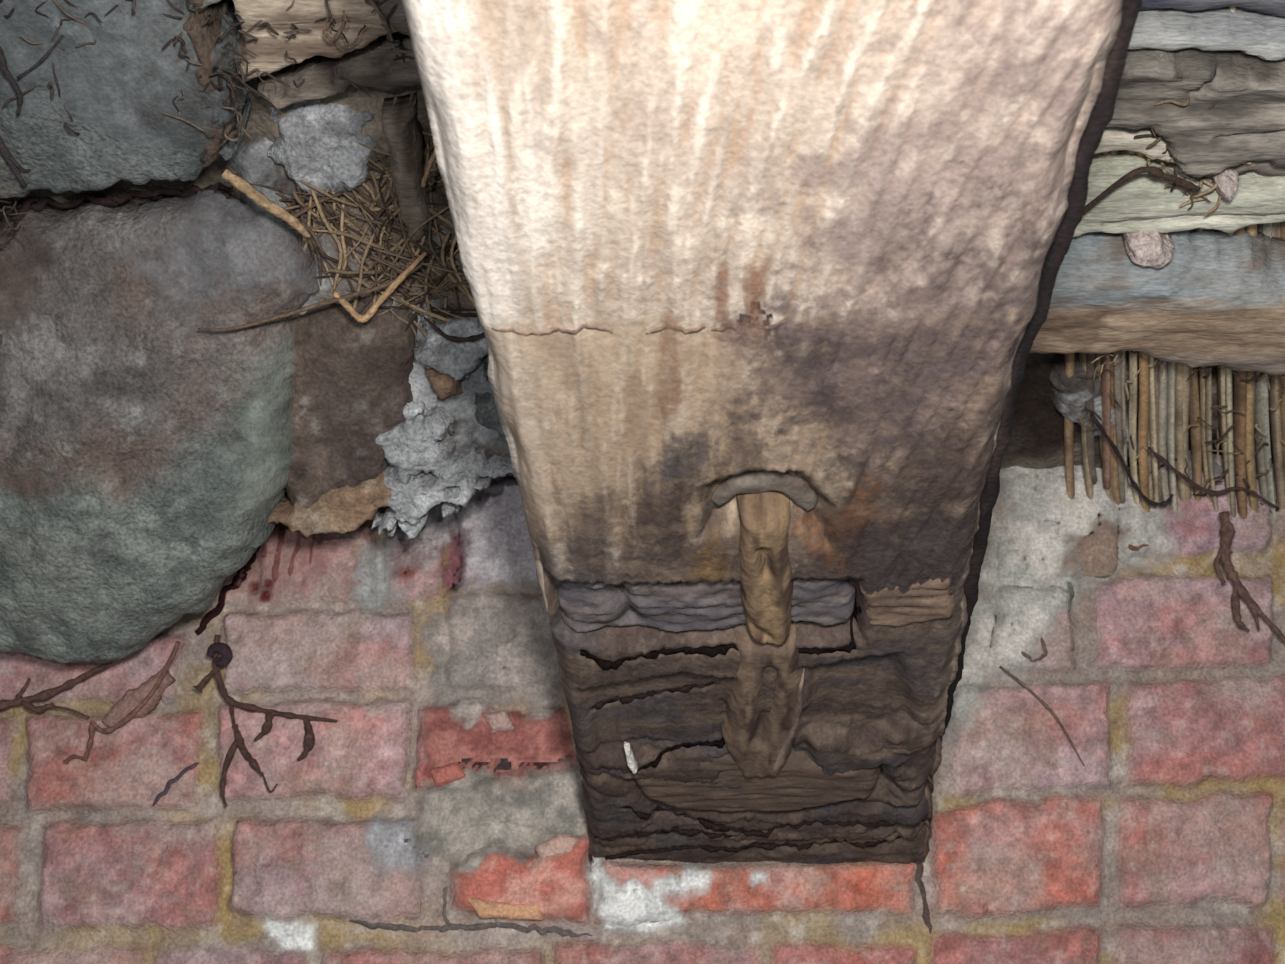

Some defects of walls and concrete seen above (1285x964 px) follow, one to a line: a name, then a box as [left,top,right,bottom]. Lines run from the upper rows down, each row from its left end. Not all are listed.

damp [491,323,613,344]
damp [538,123,1057,932]
damp [1064,521,1119,578]
crack [580,643,738,710]
spalling [423,703,575,787]
crack [630,738,725,772]
spalling [458,833,589,920]
crack [588,806,932,934]